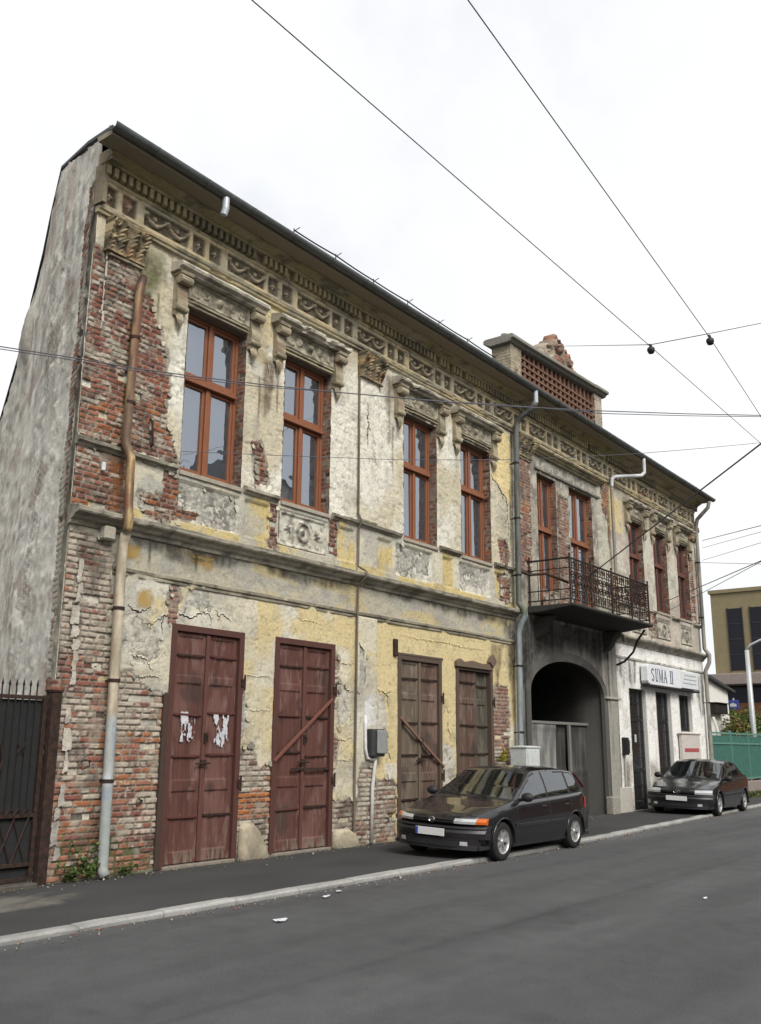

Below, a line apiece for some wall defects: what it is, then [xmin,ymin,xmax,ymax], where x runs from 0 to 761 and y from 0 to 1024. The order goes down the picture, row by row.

flaking render [250,440,269,489]
flaking render [46,180,239,883]
flaking render [266,503,280,550]
flaking render [459,457,609,604]
crack [127,603,232,681]
flaking render [493,685,511,765]
flaking render [236,687,272,860]
flaking render [332,764,398,844]